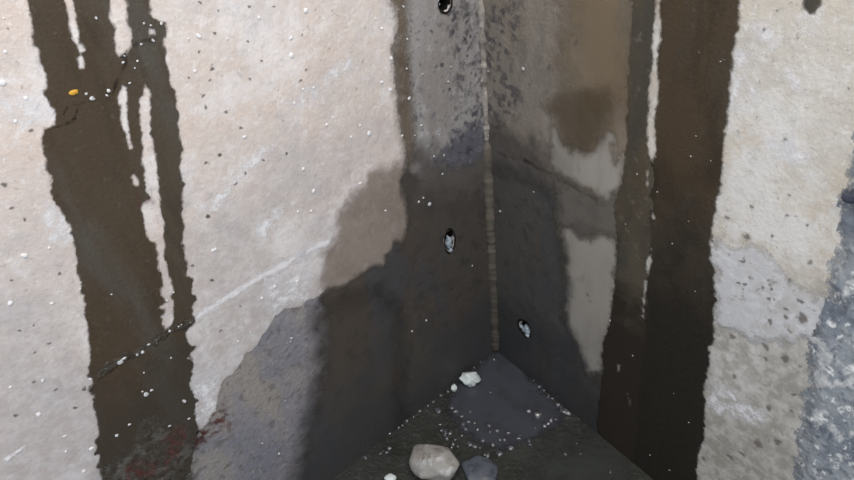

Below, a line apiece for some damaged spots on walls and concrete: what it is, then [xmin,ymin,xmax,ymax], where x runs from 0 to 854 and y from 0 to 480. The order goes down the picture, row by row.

leakage [28,0,494,480]
leakage [477,0,765,480]